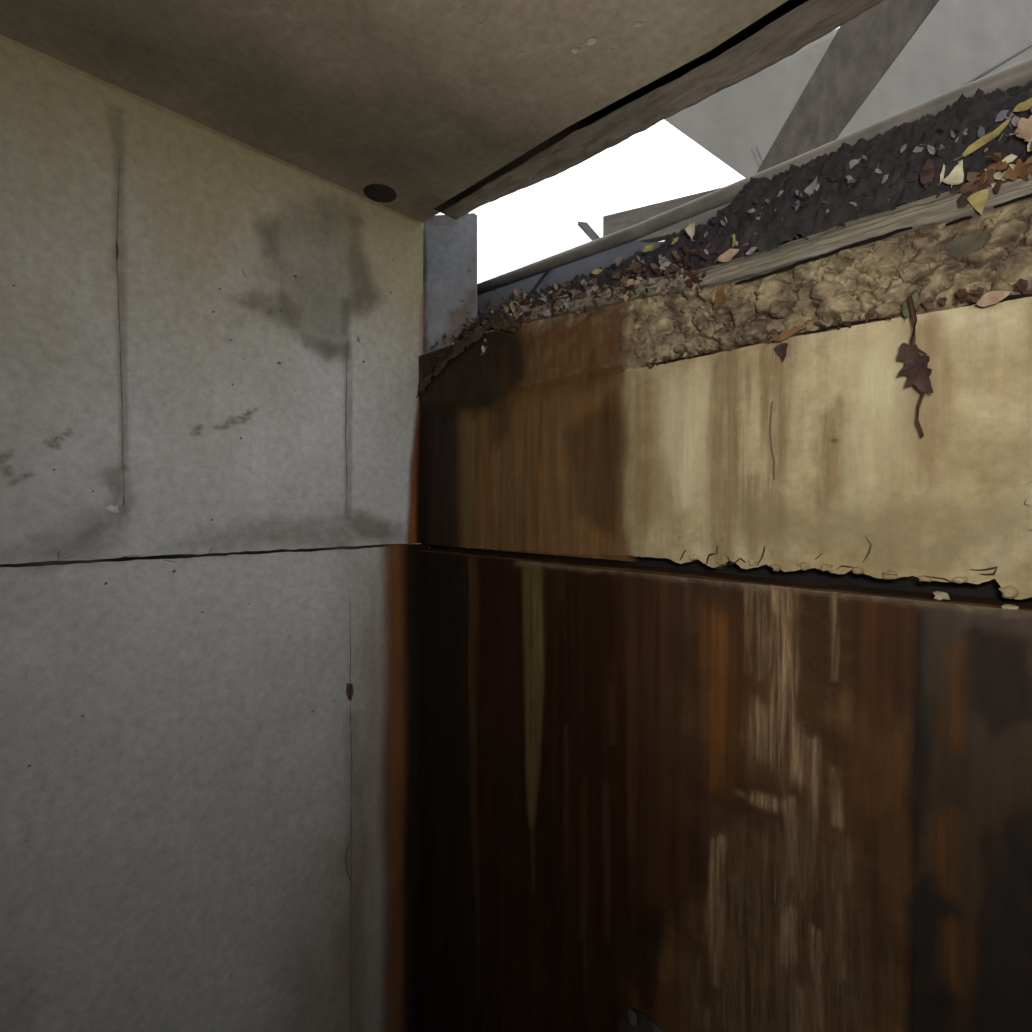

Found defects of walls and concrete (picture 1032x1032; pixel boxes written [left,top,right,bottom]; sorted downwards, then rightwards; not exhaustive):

spalling [486,193,1032,373]
crack [116,160,125,506]
corrosion [455,303,629,561]
crack [0,544,407,567]
spalling [680,546,782,571]
spalling [800,537,872,575]
spalling [882,570,897,580]
spalling [918,566,998,600]
spalling [998,585,1020,610]